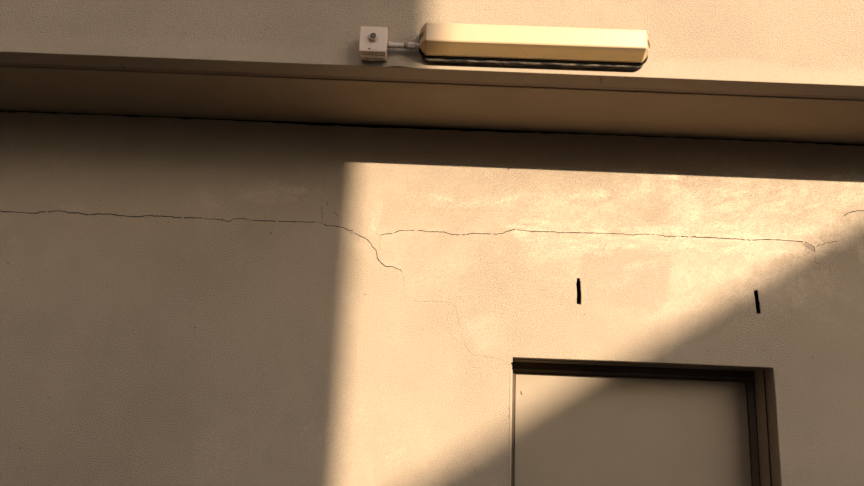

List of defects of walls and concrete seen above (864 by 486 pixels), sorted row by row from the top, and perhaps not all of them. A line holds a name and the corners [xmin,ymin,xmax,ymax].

crack [0,207,837,272]